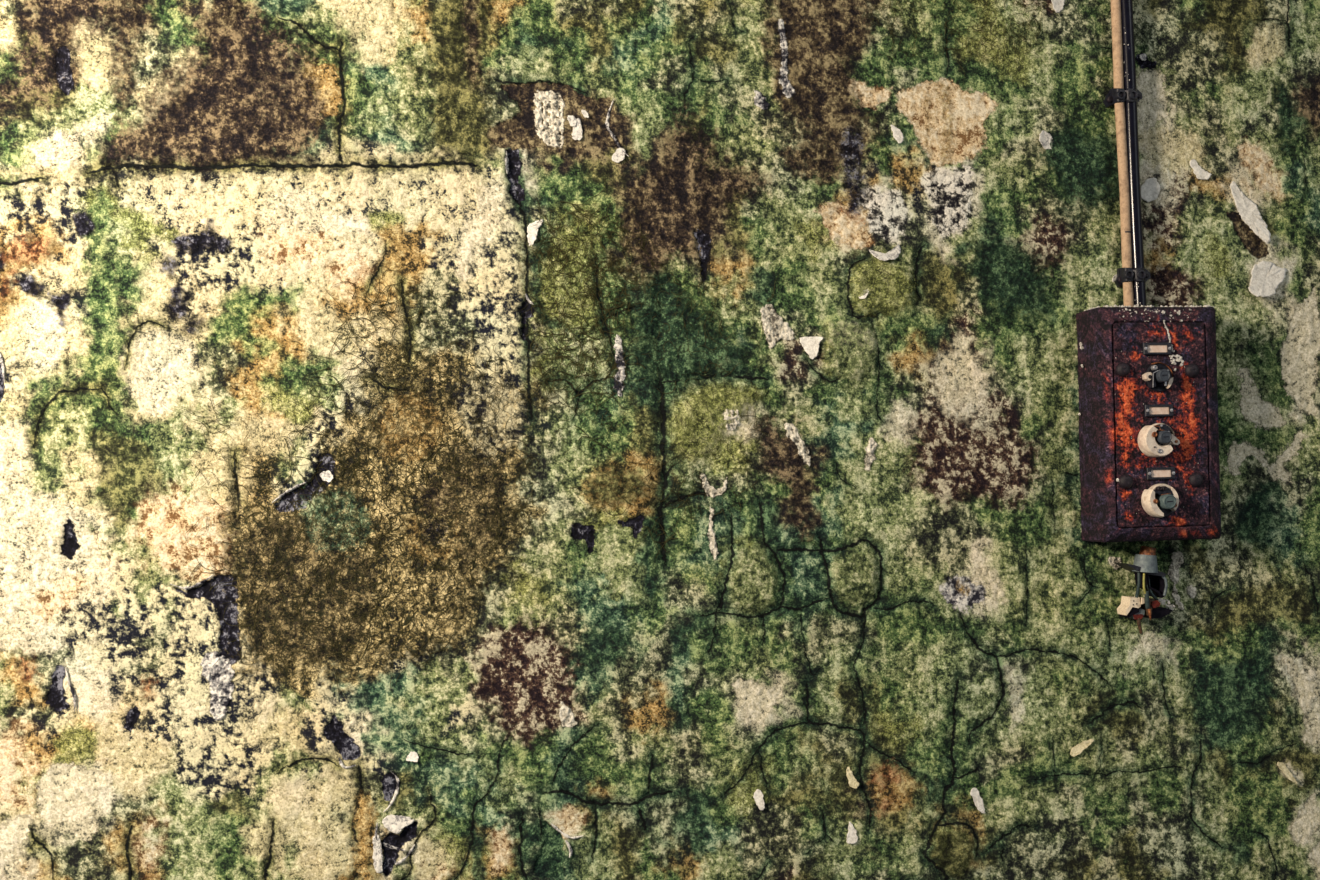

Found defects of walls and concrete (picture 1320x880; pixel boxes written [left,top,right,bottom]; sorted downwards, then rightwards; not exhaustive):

crack [0,177,45,185]
mould [0,0,336,188]
crack [86,17,478,187]
crack [509,157,666,420]
peeling [813,201,901,261]
peeling [848,77,998,233]
water stain [200,374,532,721]
flaking render [171,575,242,681]
water stain [471,614,580,742]
crack [697,472,1297,880]
peeling [0,762,107,880]
flaking render [372,770,418,877]